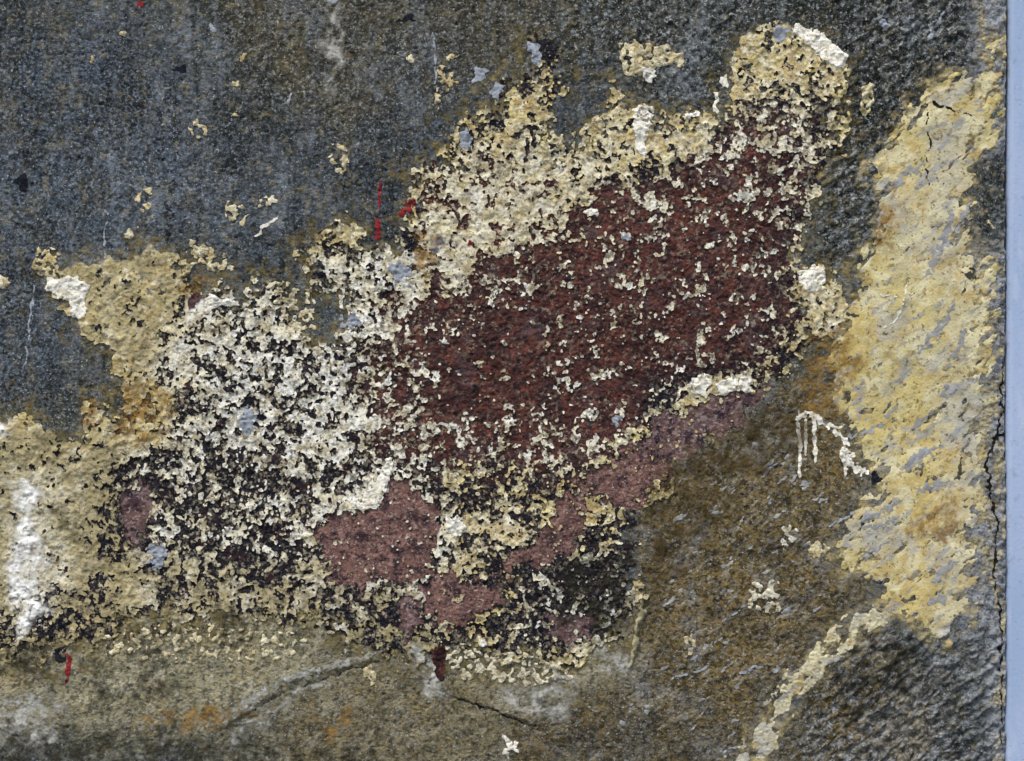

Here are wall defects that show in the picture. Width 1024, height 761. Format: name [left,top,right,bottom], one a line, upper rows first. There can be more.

peeling [982,35,1007,58]
peeling [0,20,852,670]
peeling [750,52,1006,761]
crack [984,362,1005,744]
peeling [736,738,750,761]